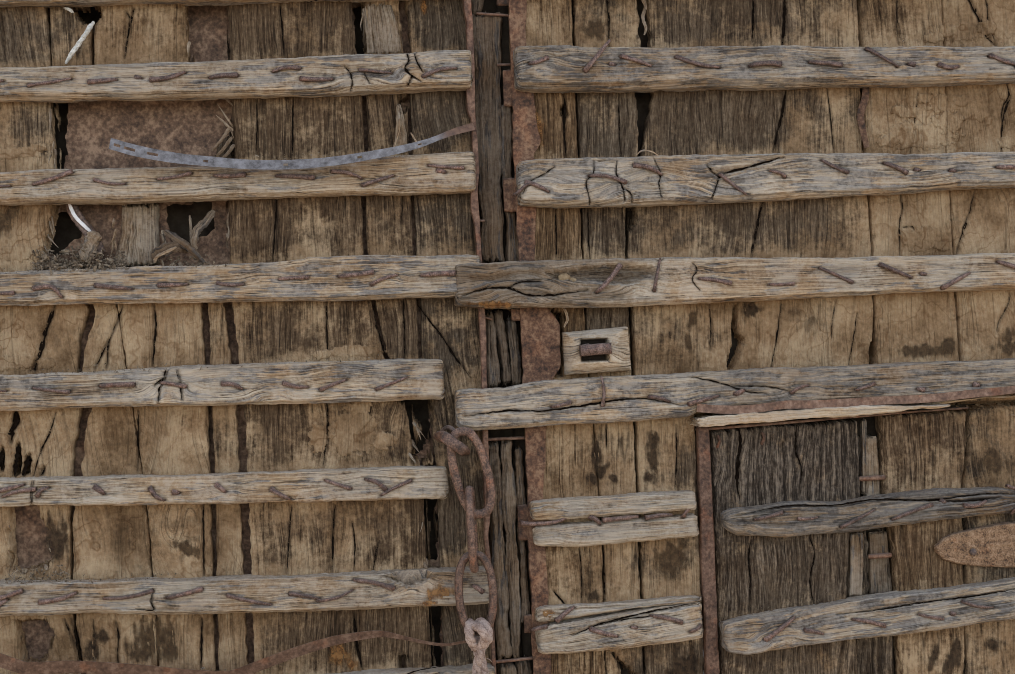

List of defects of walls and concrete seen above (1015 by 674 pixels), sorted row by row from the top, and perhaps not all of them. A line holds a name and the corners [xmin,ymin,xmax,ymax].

crack [749,0,757,38]
crack [780,0,788,45]
crack [466,280,578,297]
crack [34,311,54,370]
crack [97,309,122,366]
crack [0,412,56,502]
rust [422,584,455,606]